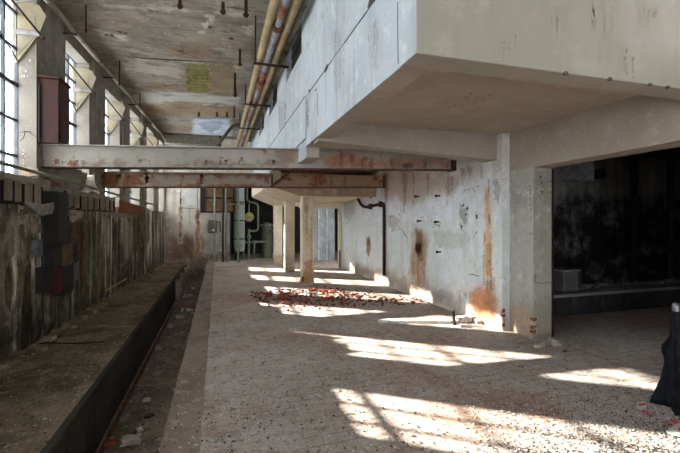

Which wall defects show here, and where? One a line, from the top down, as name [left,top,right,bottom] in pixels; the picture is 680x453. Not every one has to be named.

corrosion [53,150,300,187]
corrosion [481,182,495,279]